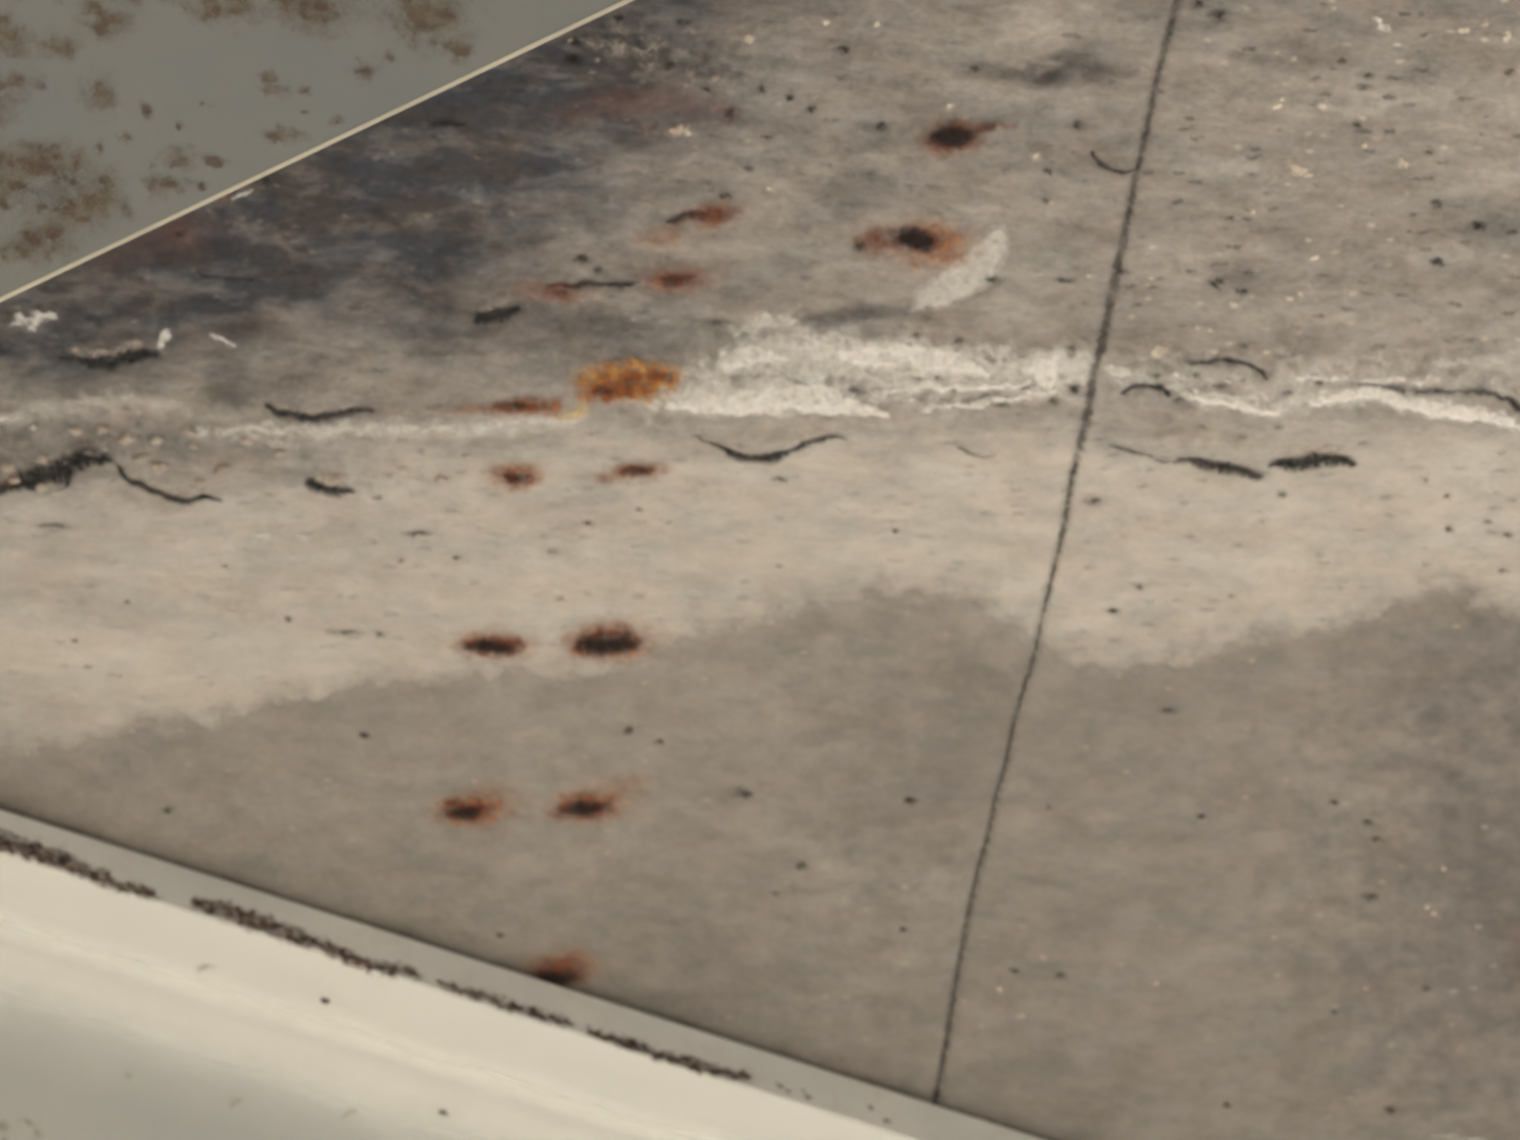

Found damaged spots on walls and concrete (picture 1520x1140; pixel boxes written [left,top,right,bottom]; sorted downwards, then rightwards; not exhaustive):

rust [855,224,962,262]
water stain [15,312,56,330]
water stain [652,313,1130,418]
crack [1120,358,1268,397]
water stain [1167,372,1520,430]
crack [1369,384,1520,411]
crack [0,449,222,504]
crack [1110,445,1357,479]
rust [462,636,526,657]
rust [571,624,646,658]
water stain [0,588,1520,1140]
rust [192,897,751,1080]